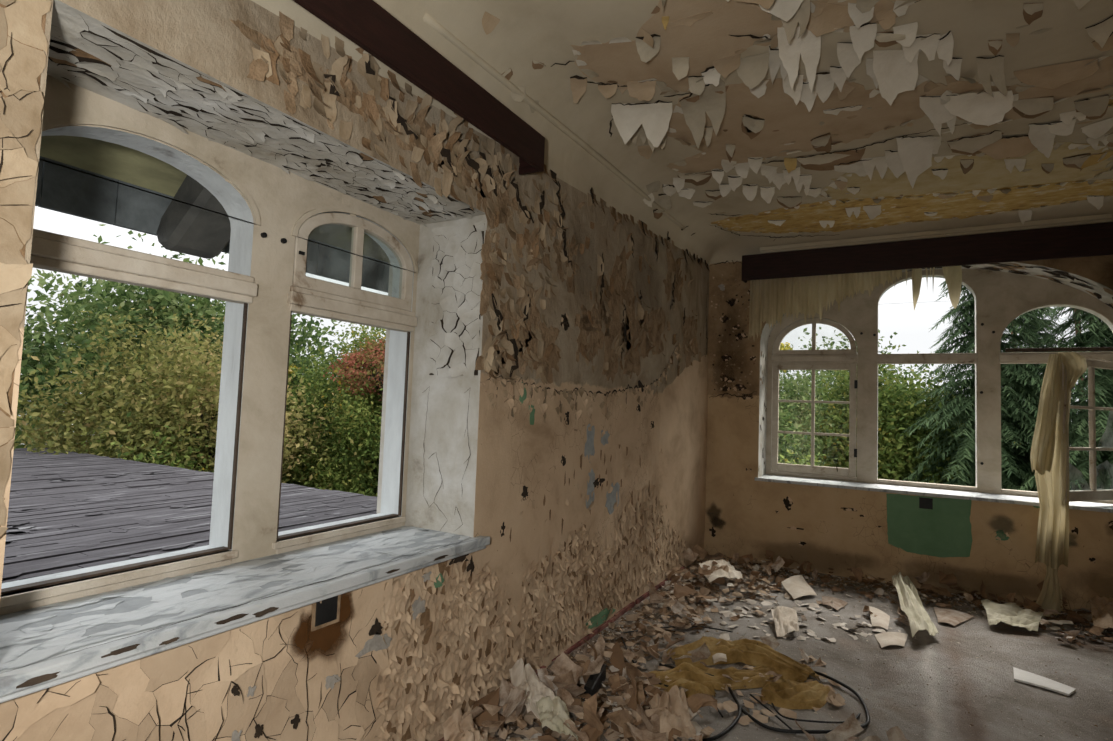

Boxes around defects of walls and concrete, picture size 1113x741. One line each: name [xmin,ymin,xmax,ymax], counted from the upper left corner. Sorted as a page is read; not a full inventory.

peeling [47,4,682,514]
crack [0,0,839,741]
crack [762,123,965,163]
peeling [961,263,1113,308]